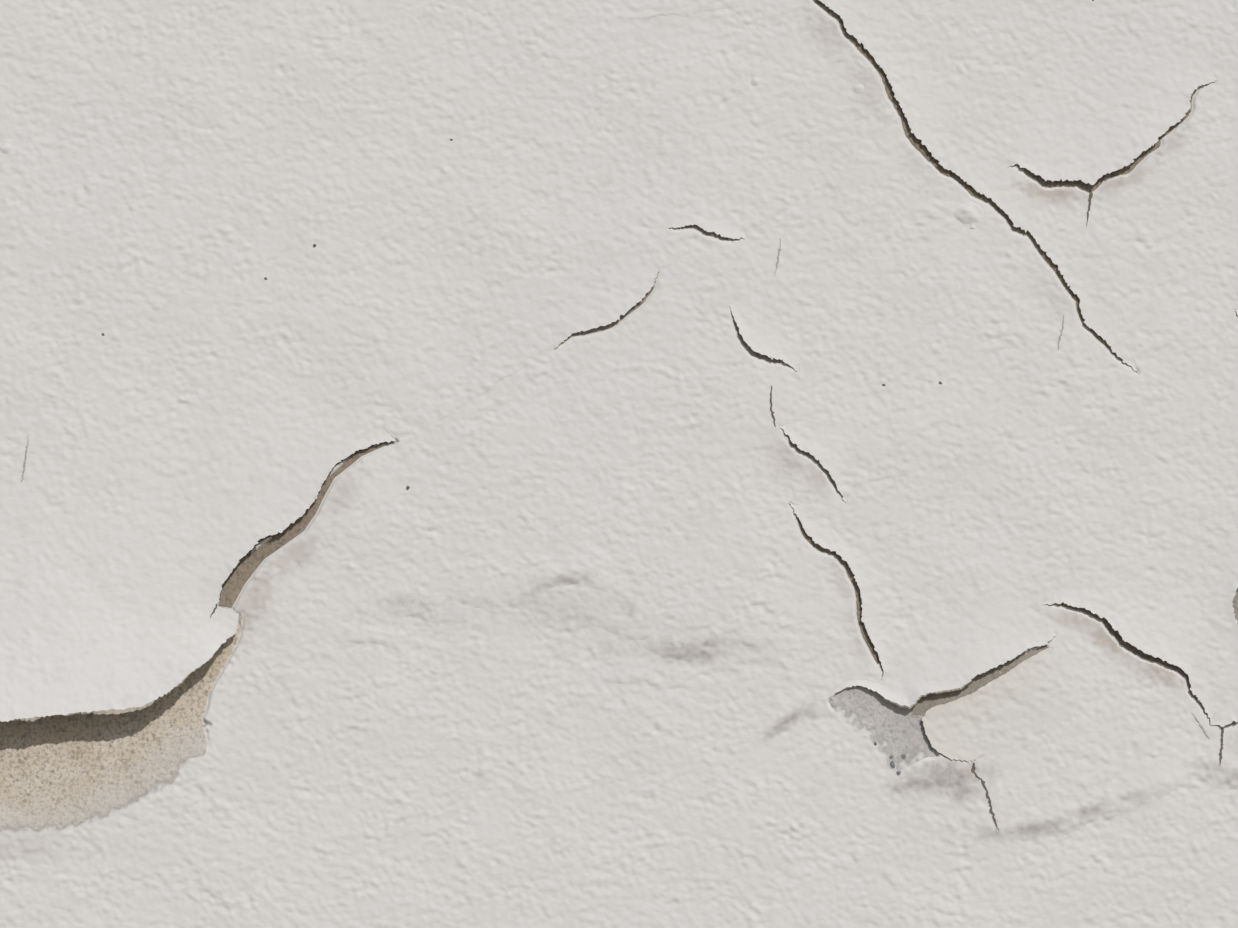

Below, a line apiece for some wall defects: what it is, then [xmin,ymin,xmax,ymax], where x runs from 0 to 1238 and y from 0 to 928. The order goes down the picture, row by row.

crack [773,238,781,273]
crack [813,0,1139,374]
crack [770,385,856,503]
peeling [0,403,396,831]
peeling [788,502,1238,830]